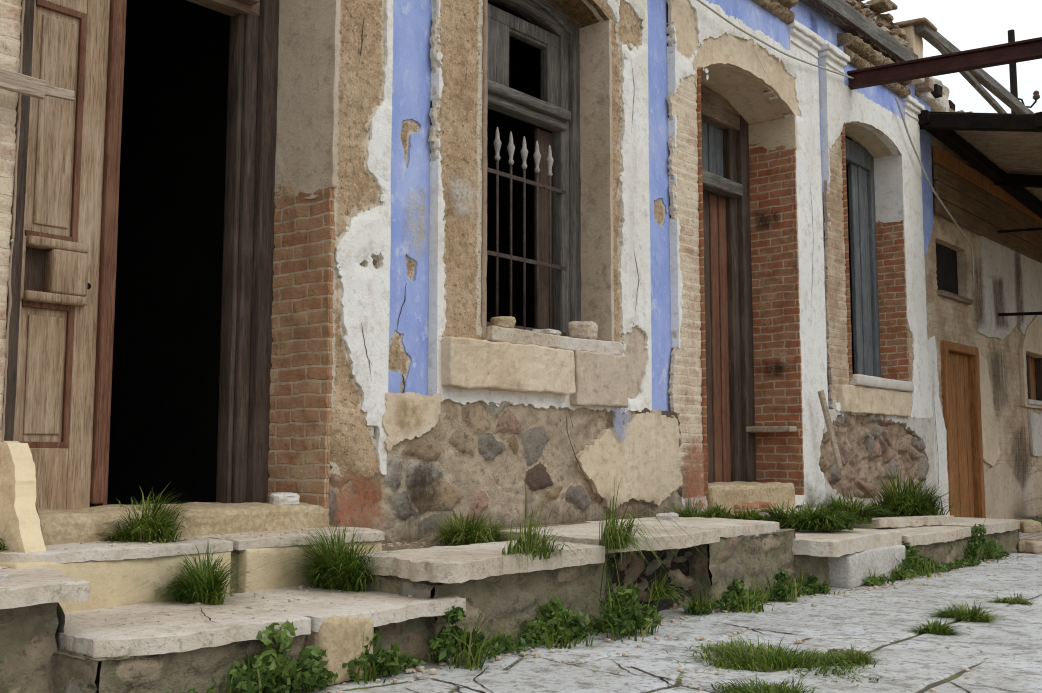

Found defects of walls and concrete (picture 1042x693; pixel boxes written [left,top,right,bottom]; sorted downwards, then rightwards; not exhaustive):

peeling [330,462,381,527]
spalling [331,0,390,458]
peeling [388,330,411,393]
spalling [400,0,484,341]
spalling [582,0,650,399]
spalling [654,0,801,510]
spalling [819,119,931,502]